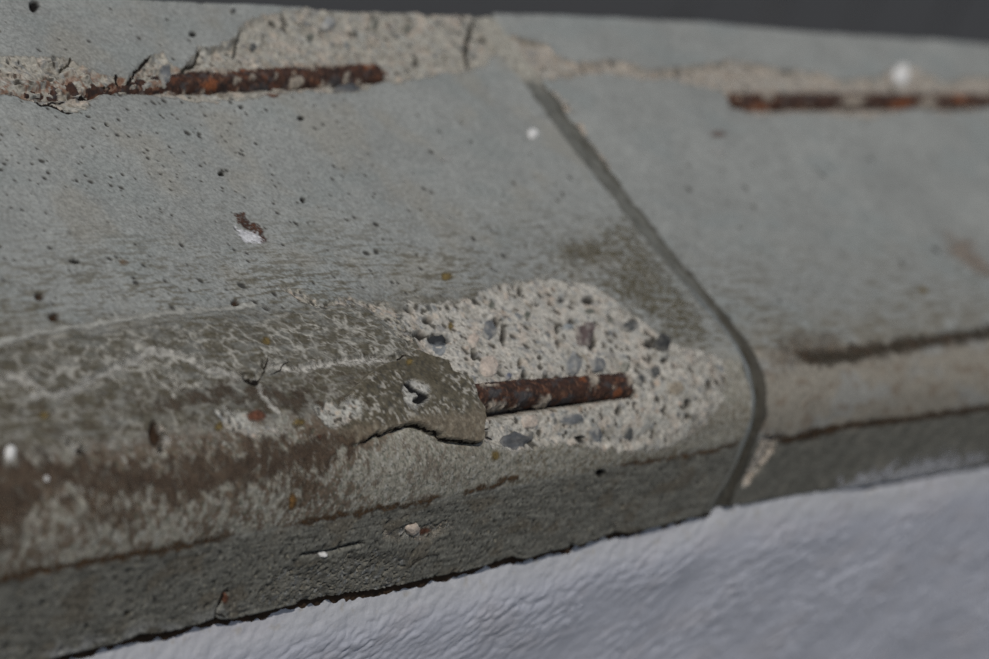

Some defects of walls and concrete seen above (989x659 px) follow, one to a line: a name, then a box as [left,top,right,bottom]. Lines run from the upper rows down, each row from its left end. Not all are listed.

spalling [0,7,498,113]
spalling [508,35,989,170]
rust [234,212,266,244]
spalling [283,278,728,454]
crack [214,590,231,617]